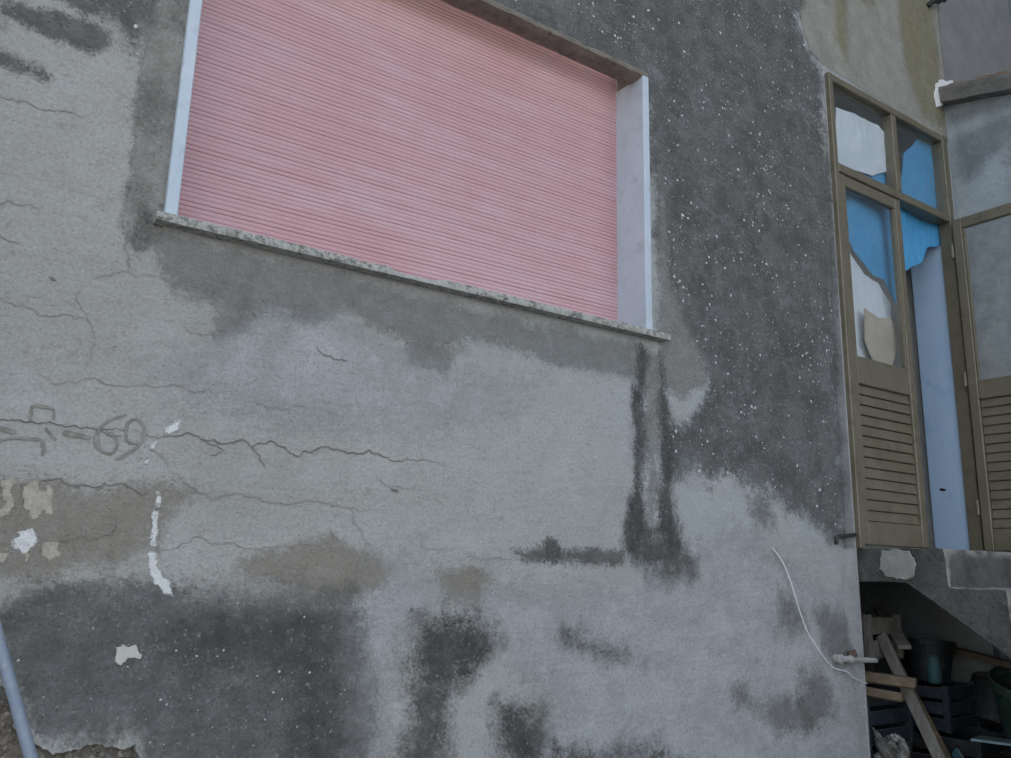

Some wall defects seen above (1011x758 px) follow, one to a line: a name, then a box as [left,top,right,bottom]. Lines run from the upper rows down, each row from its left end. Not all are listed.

water stain [0,0,110,52]
water stain [0,53,52,84]
crack [0,95,86,118]
crack [3,234,225,393]
water stain [135,210,698,581]
peeling [0,477,54,519]
crack [0,419,440,552]
spalling [0,686,23,758]
spalling [35,743,139,758]
spalling [115,645,142,665]
water stain [0,482,385,758]
water stain [399,618,496,758]